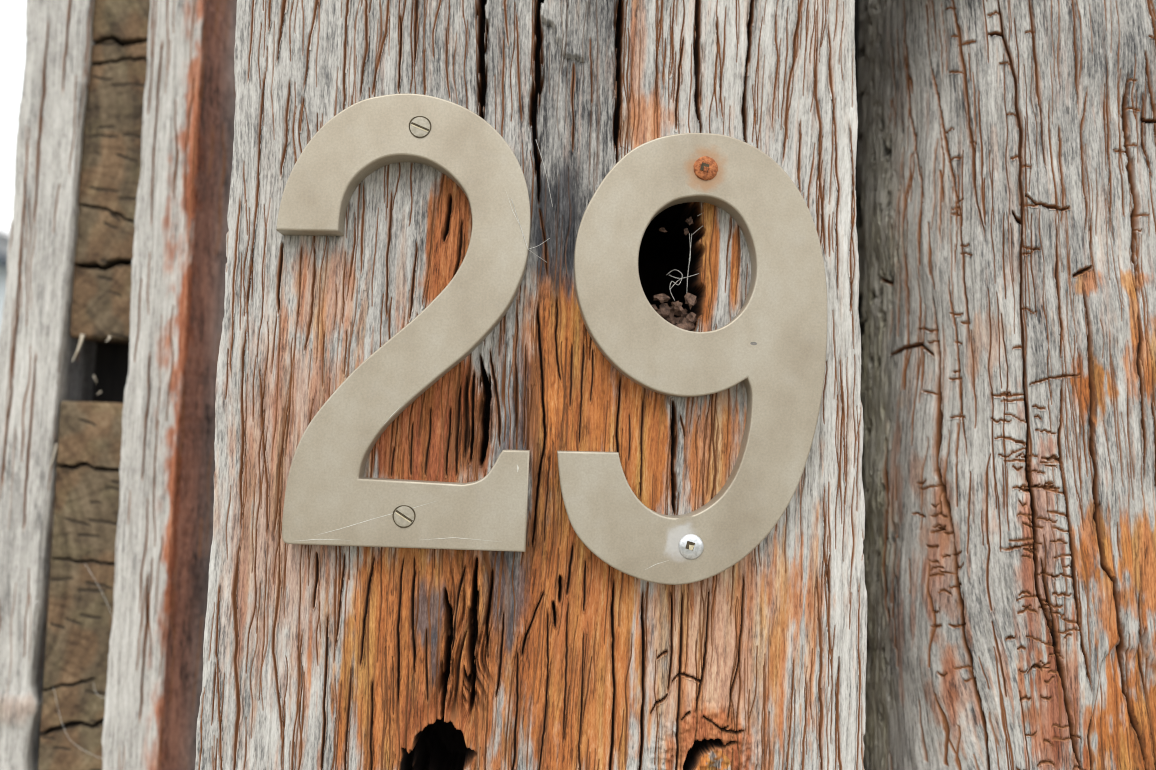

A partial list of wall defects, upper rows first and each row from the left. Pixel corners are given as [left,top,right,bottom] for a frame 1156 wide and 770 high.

crack [214,0,746,770]
rust [680,142,731,193]
crack [655,0,894,314]
crack [786,0,1156,770]